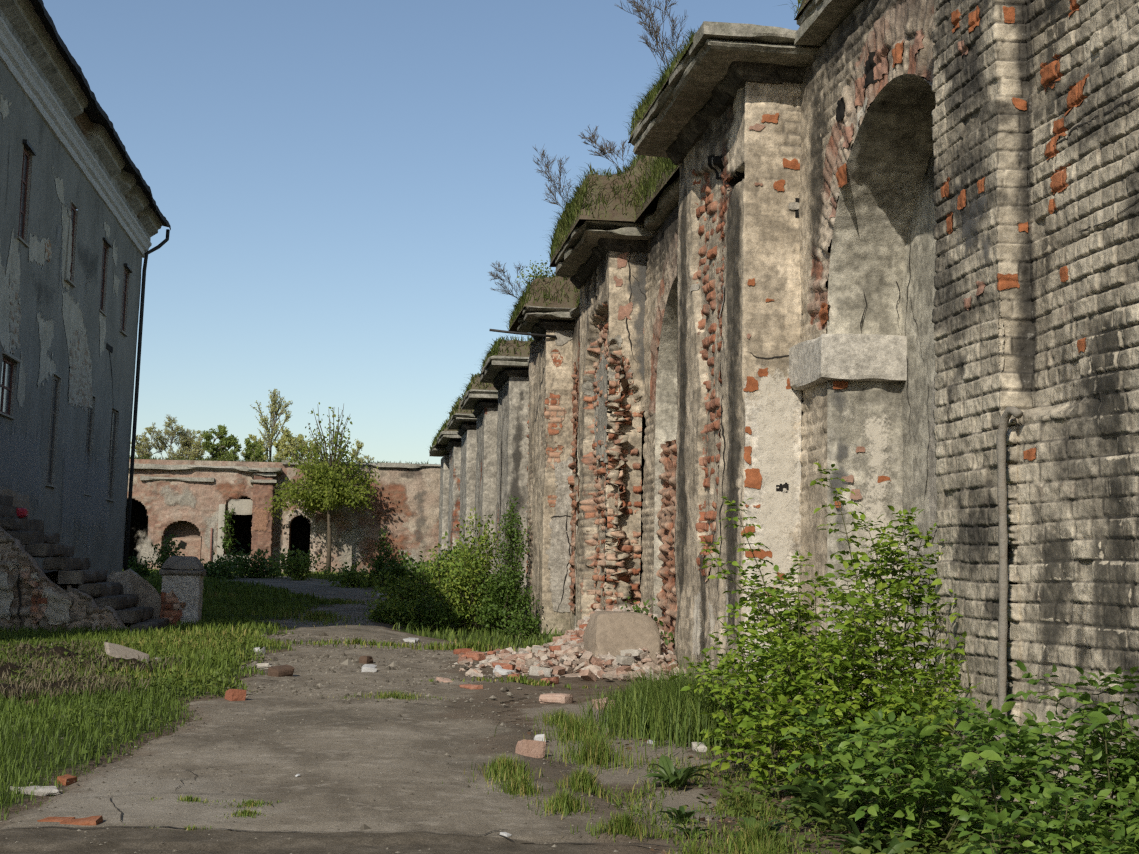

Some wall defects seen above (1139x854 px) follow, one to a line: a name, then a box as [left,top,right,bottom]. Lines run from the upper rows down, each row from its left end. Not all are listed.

leakage [1045,0,1066,126]
spalling [1040,54,1089,214]
flaking render [0,166,106,411]
flaking render [582,335,633,463]
spalling [690,154,800,582]
leakage [1086,316,1134,675]
leakage [1034,532,1072,662]
crack [2,764,326,832]